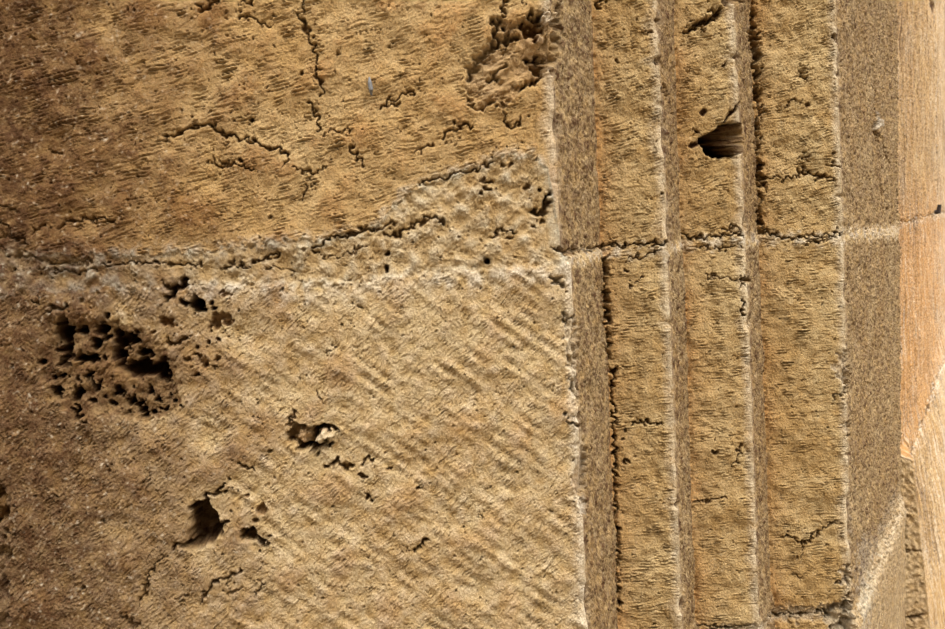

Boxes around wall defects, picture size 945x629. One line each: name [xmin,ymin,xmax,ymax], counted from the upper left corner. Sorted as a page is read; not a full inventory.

crack [296,0,365,168]
spalling [462,8,563,113]
spalling [688,101,743,159]
crack [162,121,328,201]
spalling [6,249,94,272]
spalling [208,288,234,311]
spalling [29,288,222,427]
spalling [286,423,374,480]
spalling [171,492,230,552]
spalling [239,492,272,553]